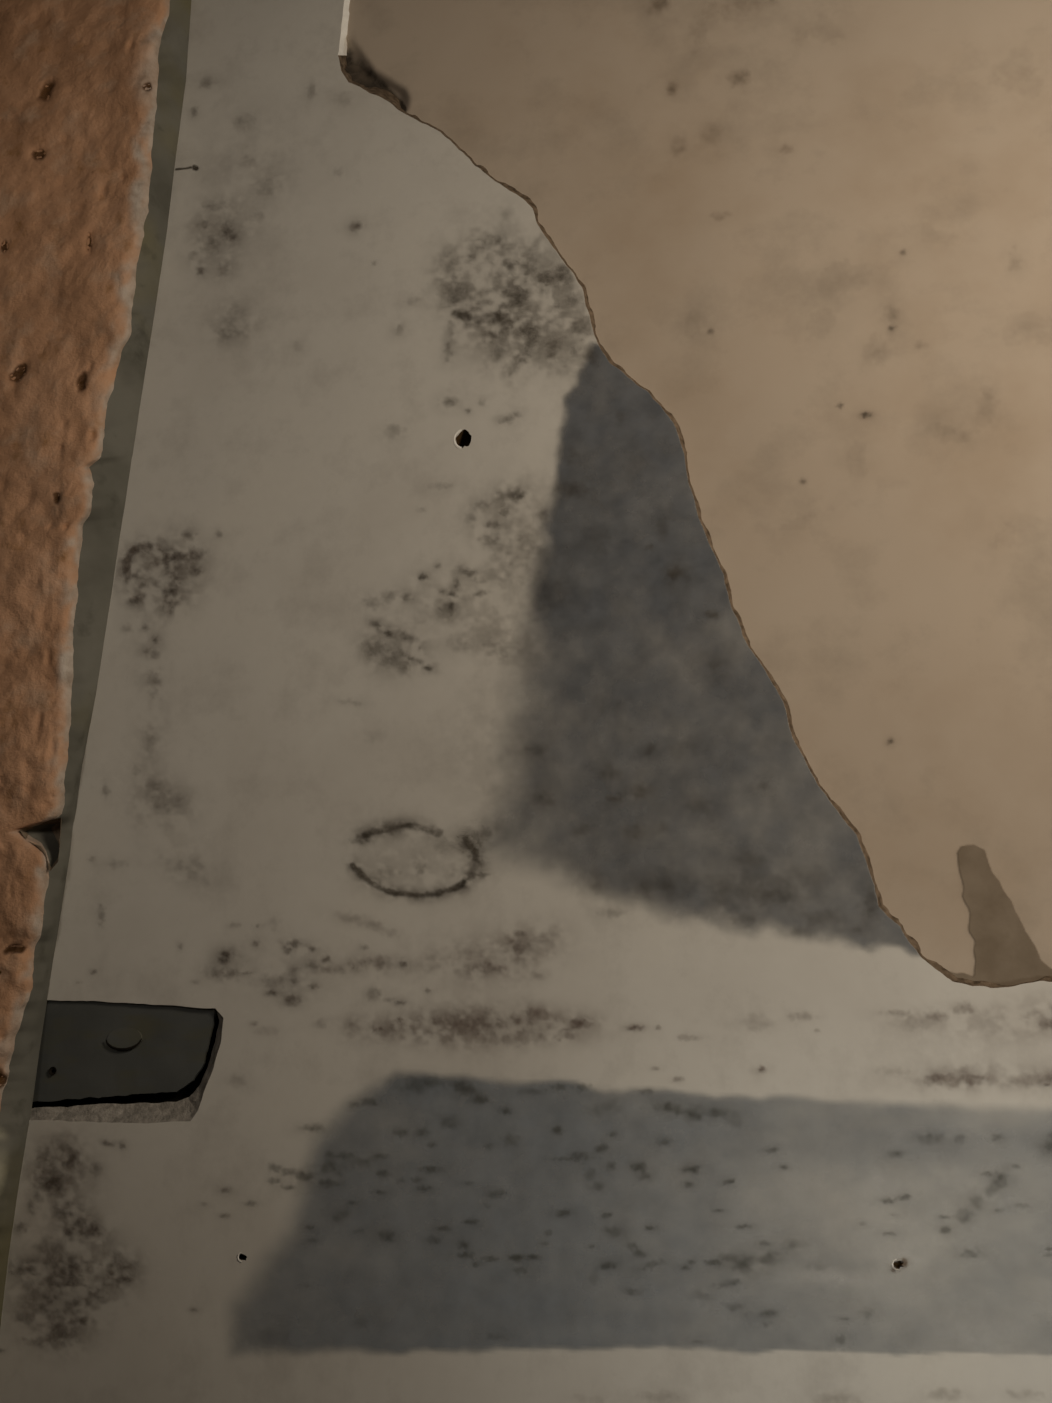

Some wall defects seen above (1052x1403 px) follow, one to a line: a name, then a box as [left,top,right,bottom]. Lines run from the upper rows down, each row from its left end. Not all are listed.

water stain [351,864,466,896]
spalling [338,0,1052,988]